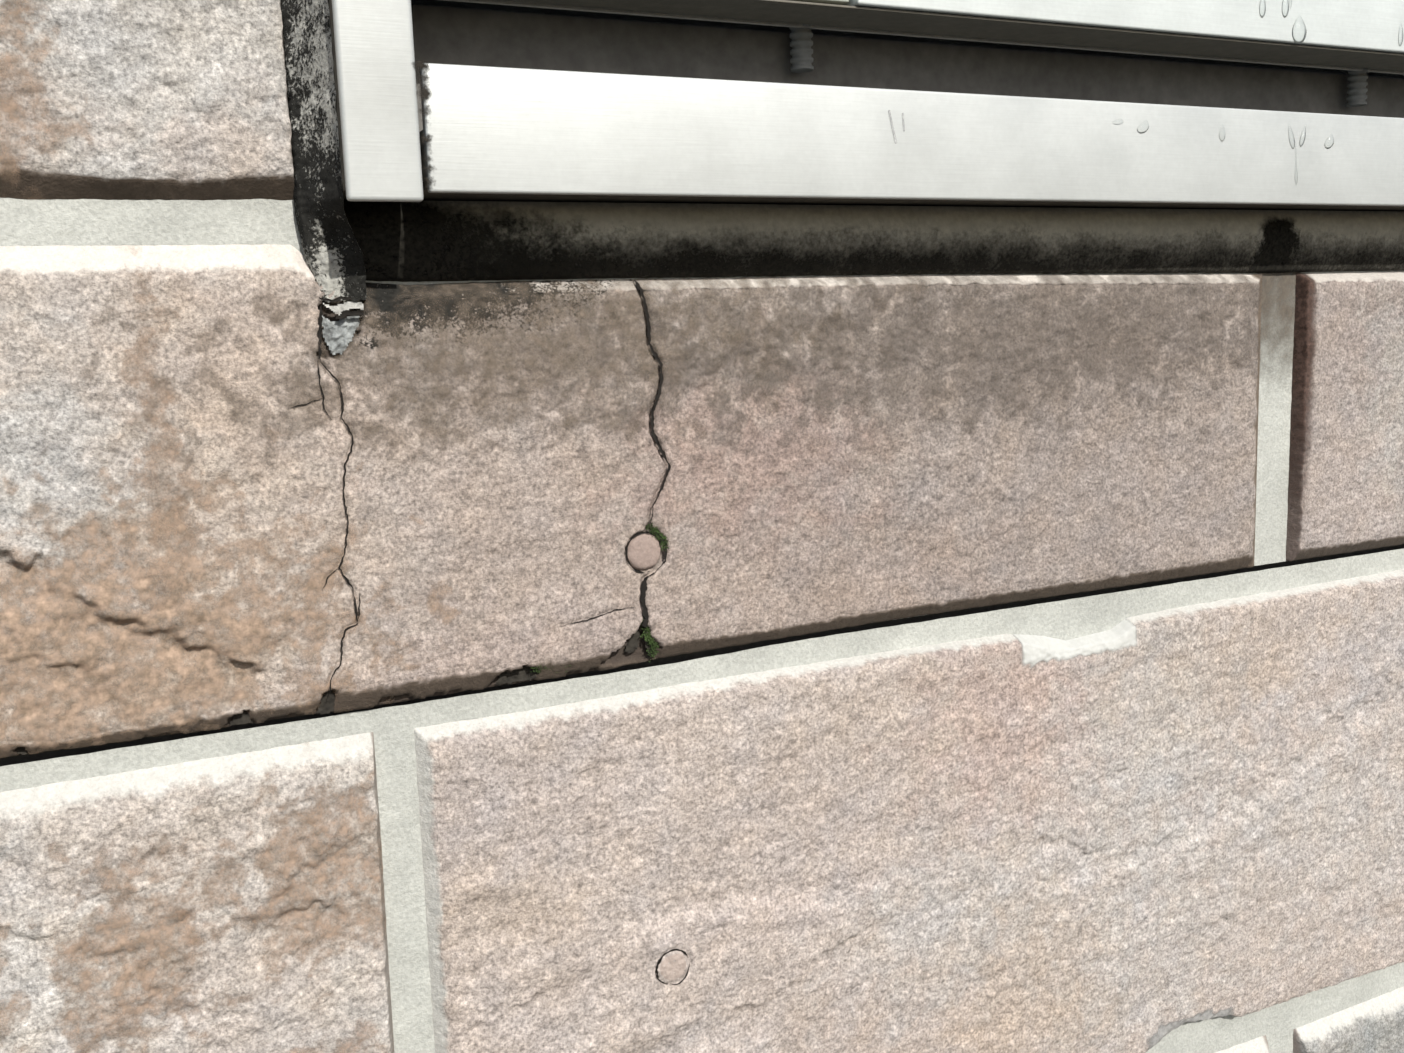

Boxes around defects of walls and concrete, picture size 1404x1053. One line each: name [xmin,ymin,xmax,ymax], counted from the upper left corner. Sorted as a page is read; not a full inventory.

damp [280,0,1404,437]
crack [291,359,360,702]
crack [564,280,671,628]